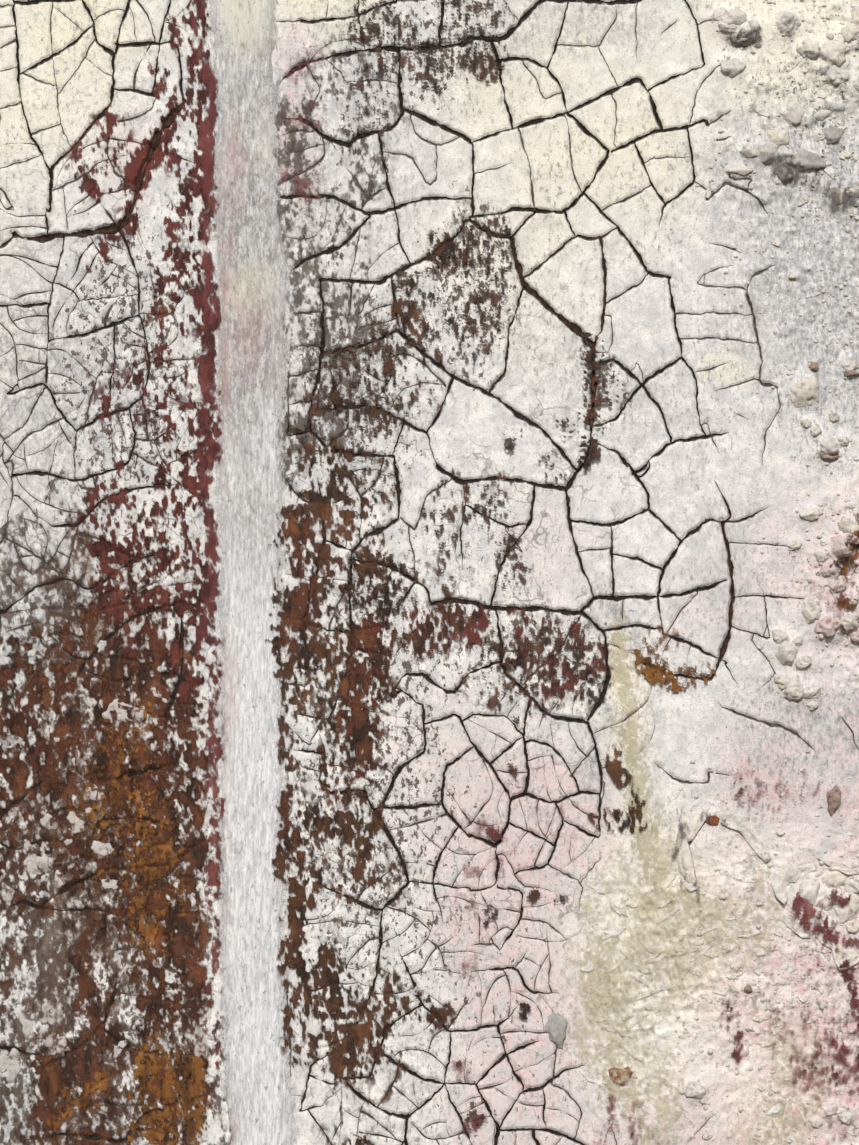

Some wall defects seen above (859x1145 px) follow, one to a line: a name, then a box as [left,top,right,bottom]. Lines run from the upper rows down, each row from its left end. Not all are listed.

crack [0,0,207,1144]
peeling [0,536,220,1145]
rust [46,0,225,1145]
peeling [265,212,534,1145]
peeling [459,649,563,731]
crack [276,0,813,1145]
peeling [536,332,632,491]
rust [632,626,716,693]
rust [799,513,859,644]